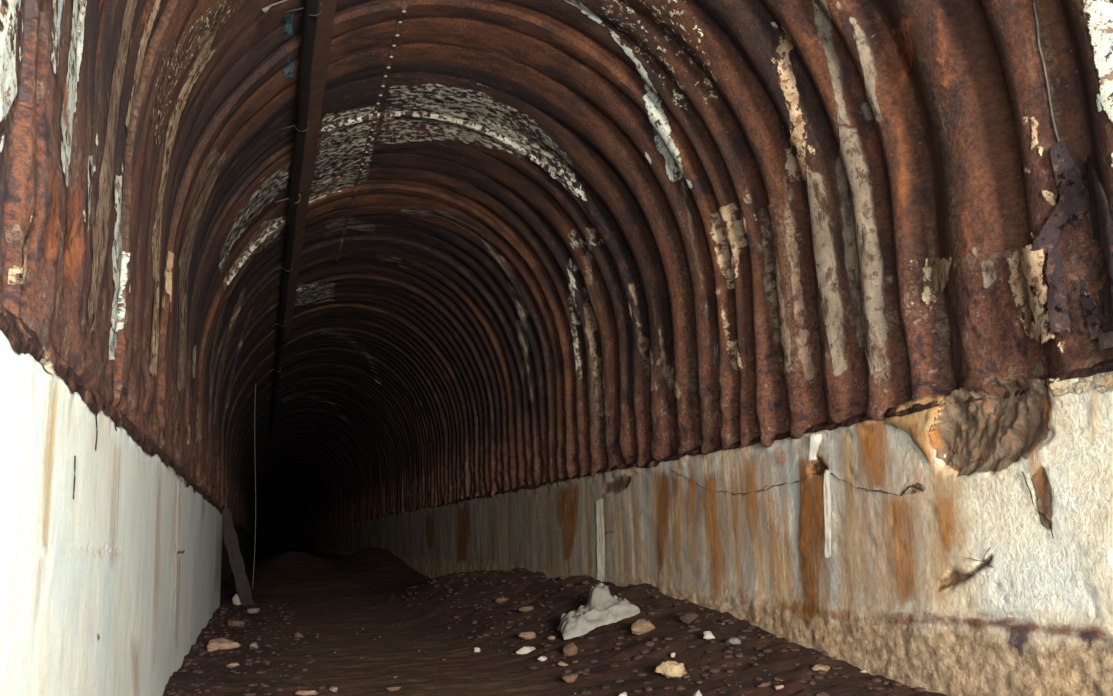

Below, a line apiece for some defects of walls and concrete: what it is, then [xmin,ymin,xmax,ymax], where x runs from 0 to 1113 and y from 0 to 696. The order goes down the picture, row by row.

peeling [0,0,23,122]
peeling [51,0,87,187]
peeling [565,0,720,192]
peeling [1083,0,1113,121]
rust [44,174,84,287]
peeling [700,0,893,382]
rust [44,389,56,544]
rust [658,471,722,598]
crack [672,468,924,496]
rust [777,457,859,623]
spalling [929,371,1113,476]
rust [931,615,1107,640]